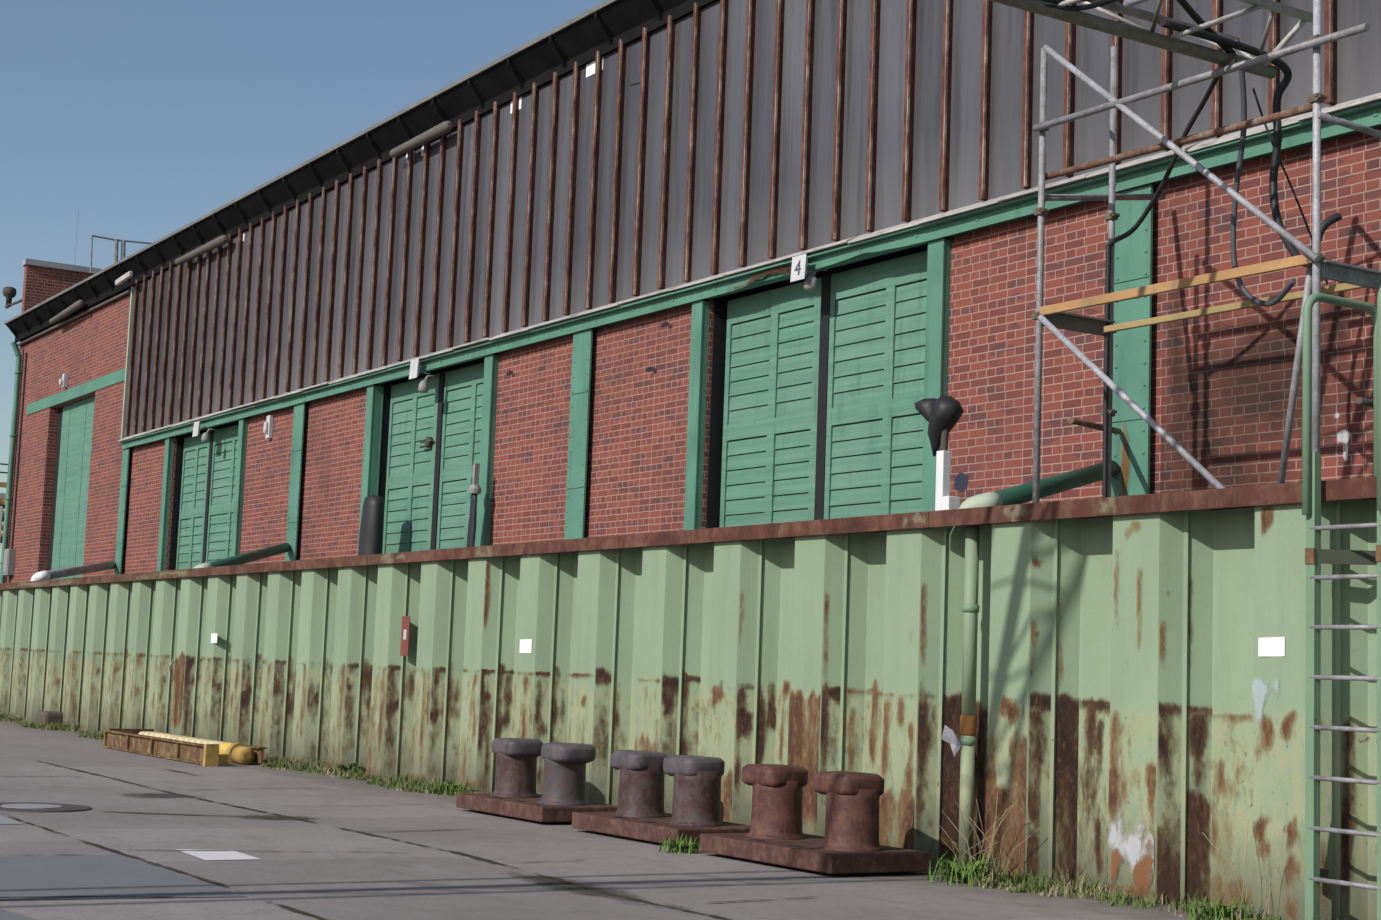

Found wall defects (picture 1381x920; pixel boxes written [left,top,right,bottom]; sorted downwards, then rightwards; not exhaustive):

rust [1261,507,1273,534]
rust [0,646,611,790]
rust [581,700,619,758]
rust [1229,711,1295,754]
rust [634,672,1251,909]
peeling [1108,813,1154,893]
rust [1253,818,1270,858]
rust [1285,819,1299,919]
rust [1320,720,1356,898]